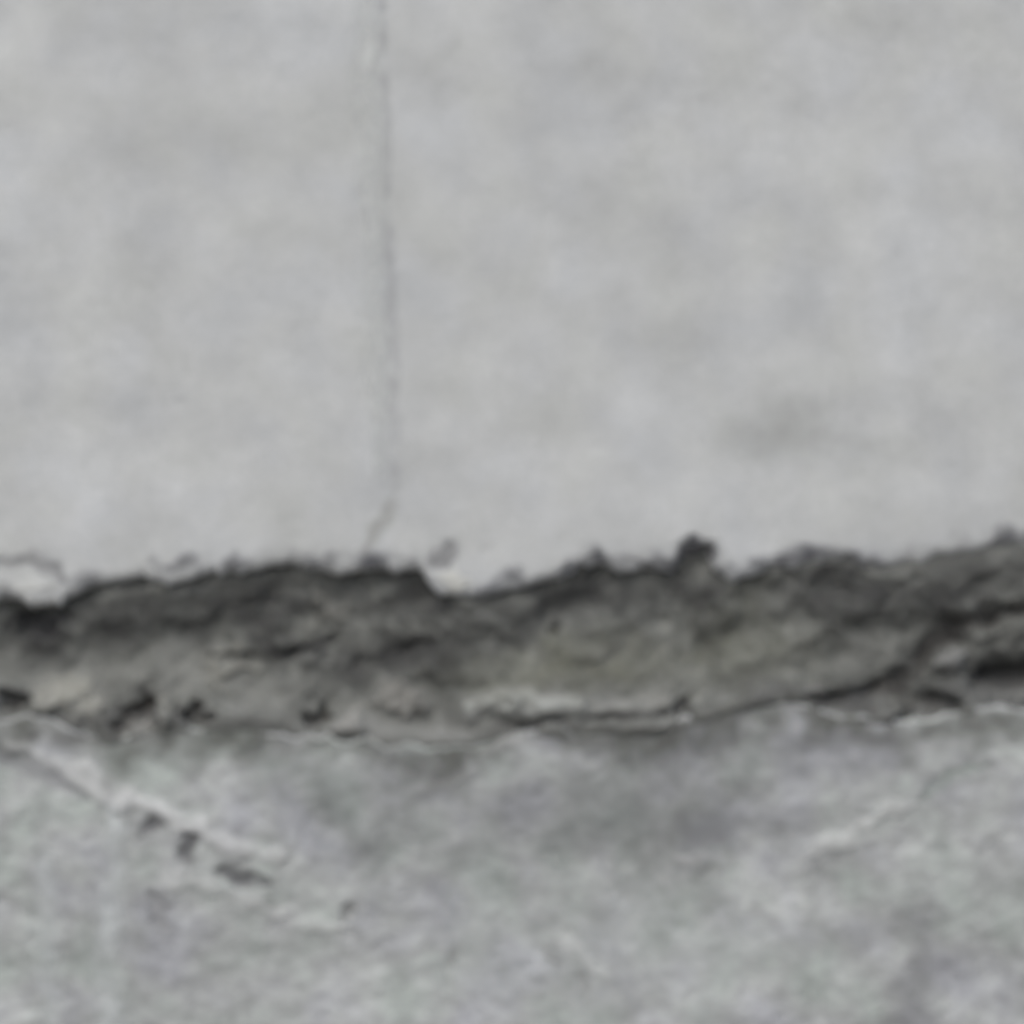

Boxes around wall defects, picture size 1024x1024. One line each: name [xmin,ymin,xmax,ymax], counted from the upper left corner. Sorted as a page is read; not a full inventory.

crack [359,0,389,72]
crack [373,71,402,447]
spalling [0,548,69,596]
spalling [425,540,472,596]
spalling [566,535,722,572]